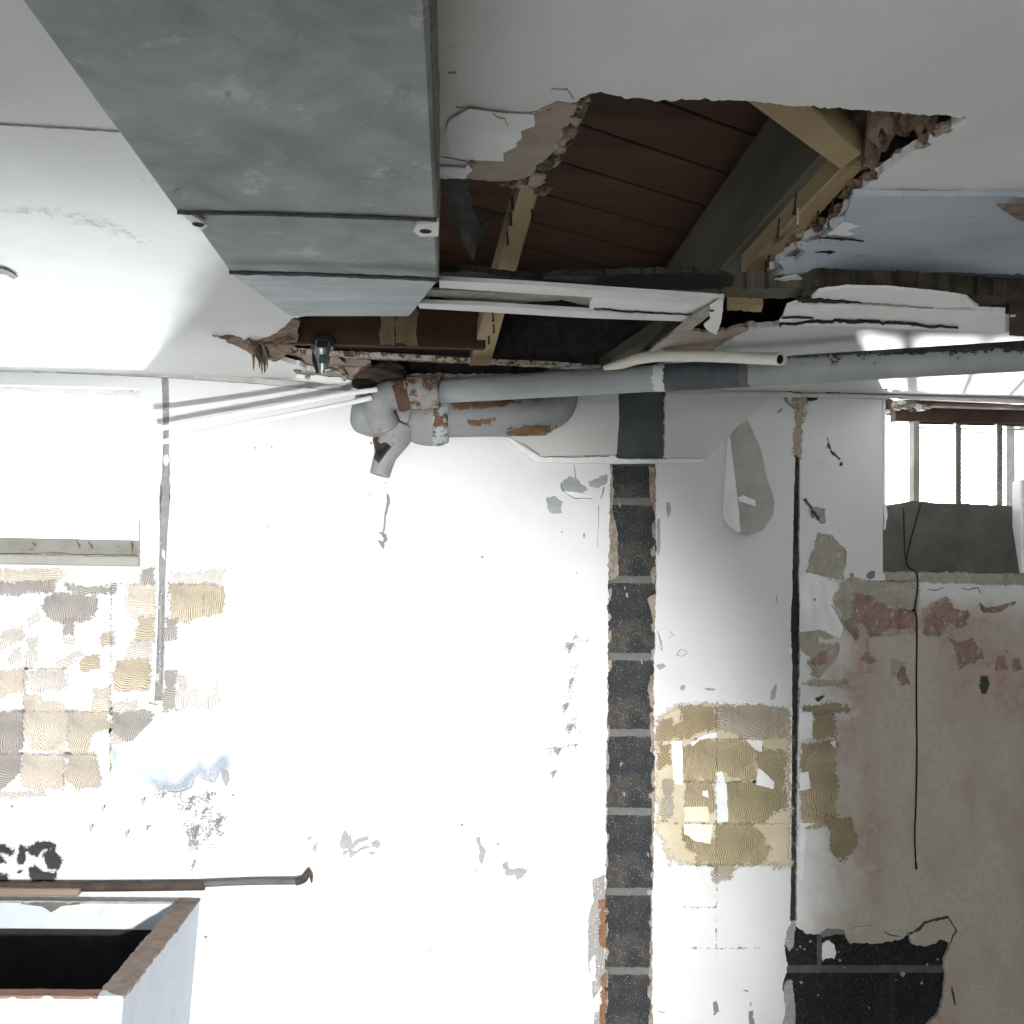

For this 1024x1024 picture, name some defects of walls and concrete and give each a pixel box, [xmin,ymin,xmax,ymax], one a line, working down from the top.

peeling [440,94,591,189]
spalling [783,110,964,255]
rust [390,378,411,412]
rust [432,399,522,446]
rust [506,424,558,436]
leakage [798,629,850,716]
leakage [978,675,991,694]
peeling [671,733,717,785]
peeling [684,771,729,844]
peeling [0,840,63,882]
leakage [824,814,859,863]
spalling [782,919,948,1024]